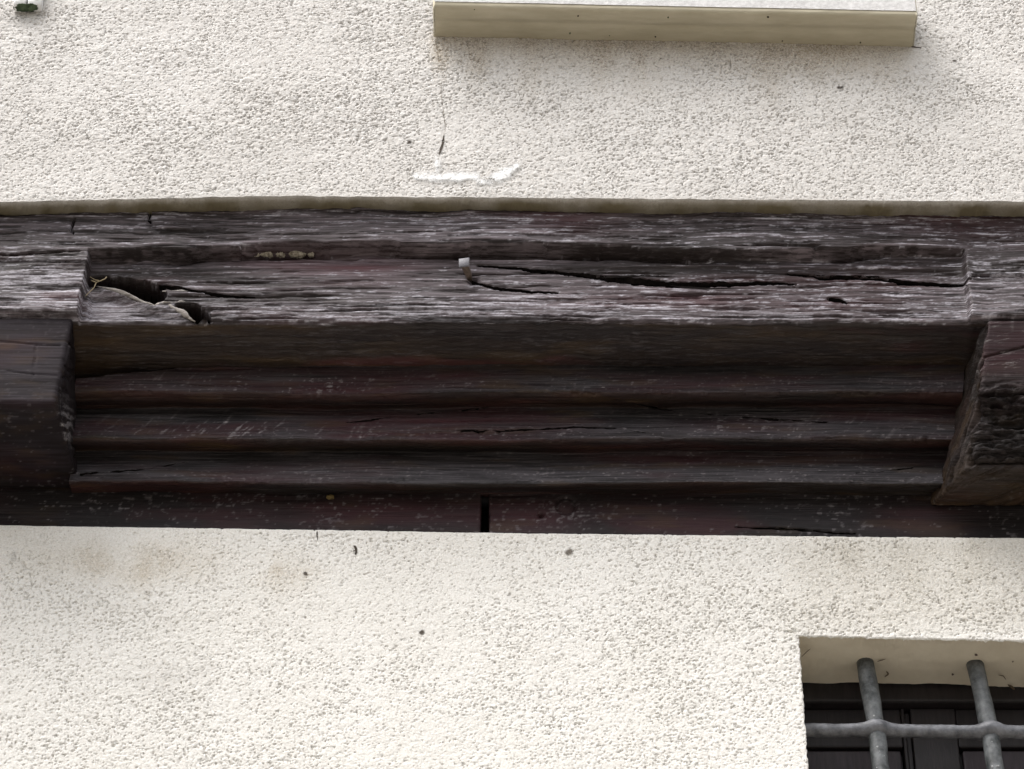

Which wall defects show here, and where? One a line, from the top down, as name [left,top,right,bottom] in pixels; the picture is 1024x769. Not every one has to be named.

crack [435,41,445,174]
crack [159,285,255,299]
crack [472,266,1022,304]
crack [347,405,827,434]